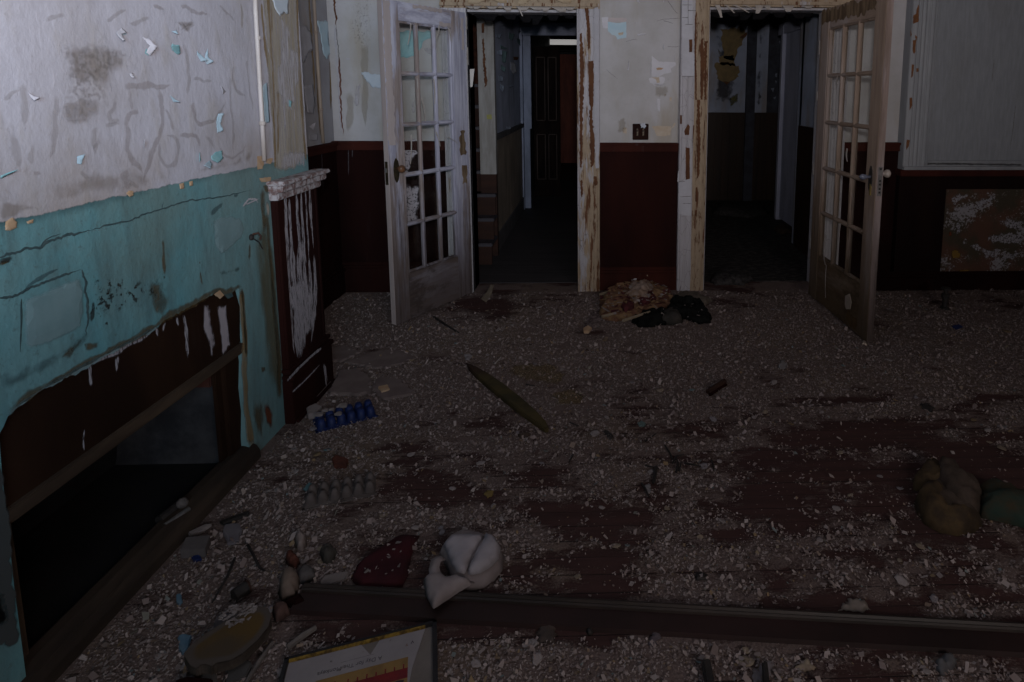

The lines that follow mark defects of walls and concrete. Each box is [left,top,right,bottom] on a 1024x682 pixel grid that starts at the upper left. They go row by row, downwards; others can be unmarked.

peeling [141,30,181,60]
peeling [466,6,627,197]
peeling [649,0,813,217]
crack [0,191,246,258]
peeling [940,189,1024,271]
spalling [10,286,239,414]